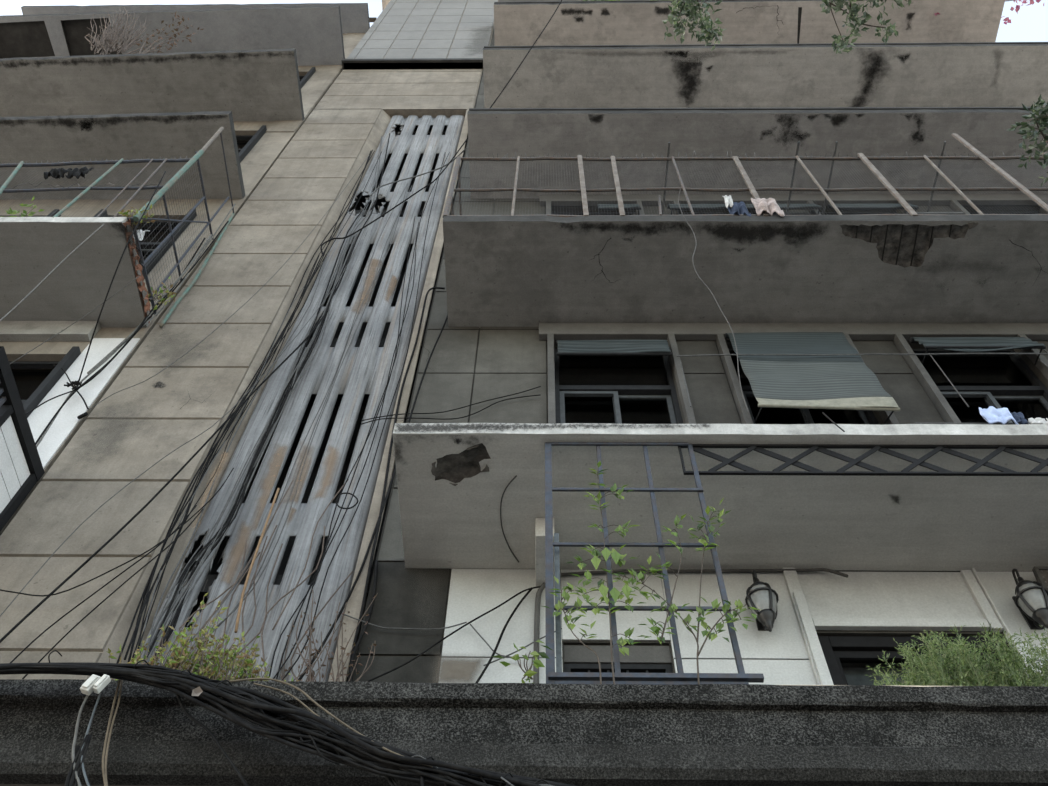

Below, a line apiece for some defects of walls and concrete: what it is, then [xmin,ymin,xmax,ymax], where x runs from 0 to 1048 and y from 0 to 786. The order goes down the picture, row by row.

water stain [808,53,883,126]
water stain [762,114,807,143]
water stain [906,115,923,142]
spalling [840,222,978,268]
spalling [431,443,491,486]